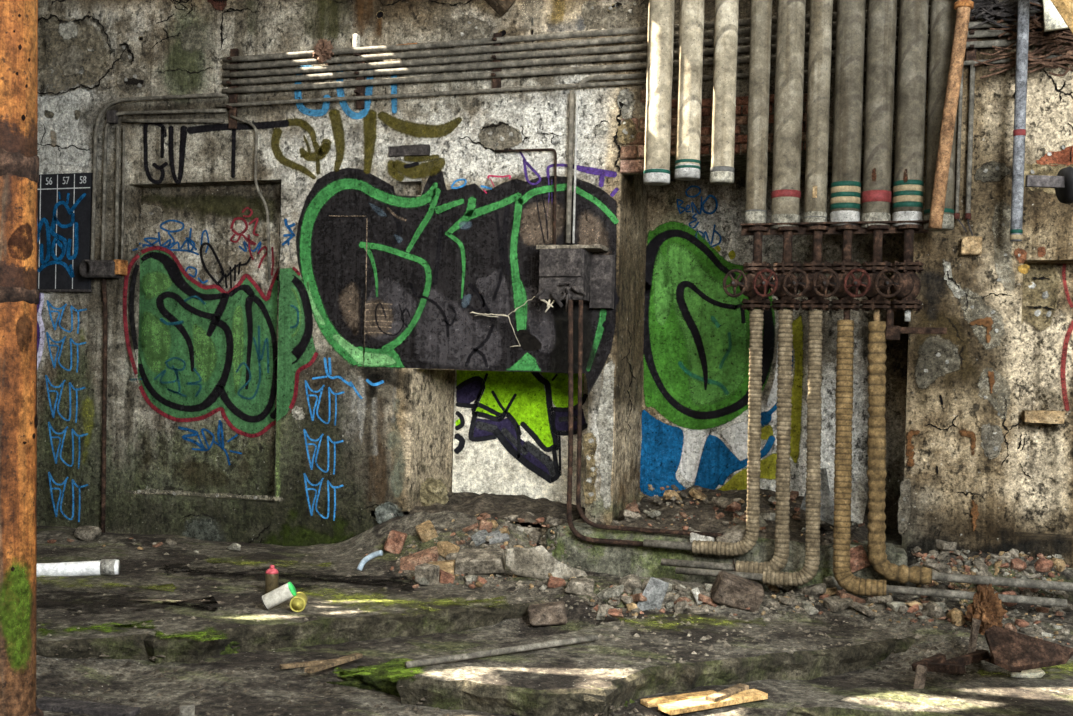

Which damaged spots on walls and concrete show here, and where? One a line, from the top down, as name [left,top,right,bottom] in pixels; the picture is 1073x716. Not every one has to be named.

crack [381,0,472,8]
crack [150,0,259,74]
spalling [13,13,151,167]
spalling [478,121,523,150]
flaking render [613,88,646,175]
flaking render [700,98,713,155]
flaking render [734,96,748,154]
rust [0,148,39,184]
rust [8,223,33,260]
rust [0,286,40,352]
water stain [907,531,1071,564]